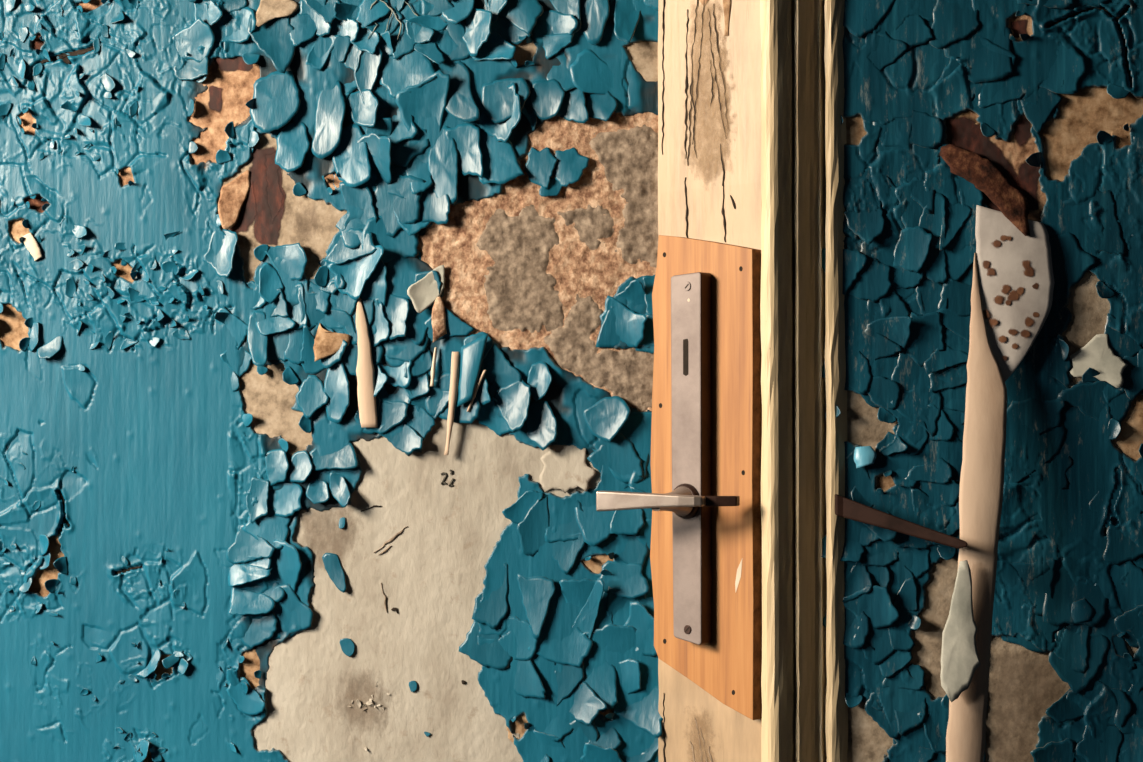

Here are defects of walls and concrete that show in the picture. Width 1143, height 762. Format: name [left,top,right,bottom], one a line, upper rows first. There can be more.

peeling [0,0,51,91]
crack [1049,6,1132,87]
peeling [0,73,101,161]
flaking render [10,195,50,261]
corrosion [229,147,286,245]
corrosion [946,114,1040,212]
flaking render [0,302,63,359]
flaking render [53,0,663,762]
crack [51,491,70,541]
crack [115,566,142,574]